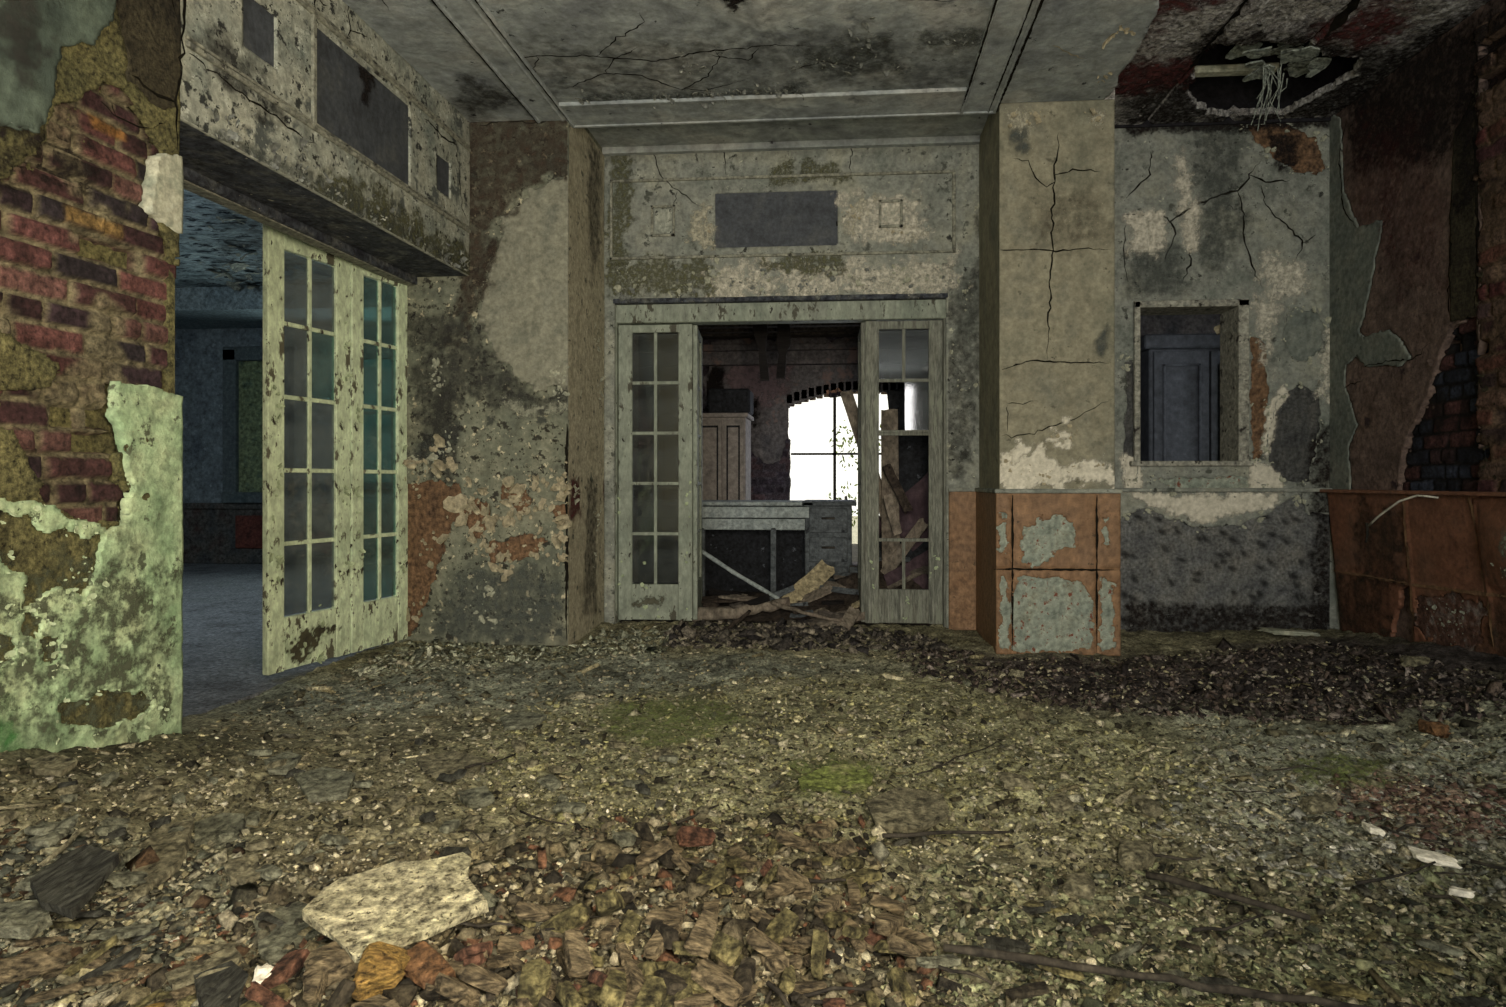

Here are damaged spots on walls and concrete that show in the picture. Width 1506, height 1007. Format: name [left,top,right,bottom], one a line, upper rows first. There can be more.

spalling [0,72,176,679]
peeling [284,260,332,286]
peeling [422,357,449,396]
damp [407,75,568,483]
peeling [392,430,621,637]
crack [524,15,855,91]
crack [1002,136,1315,438]
spalling [995,305,1332,655]
peeling [1239,124,1330,175]
crack [1338,124,1354,222]
spalling [1402,9,1506,492]